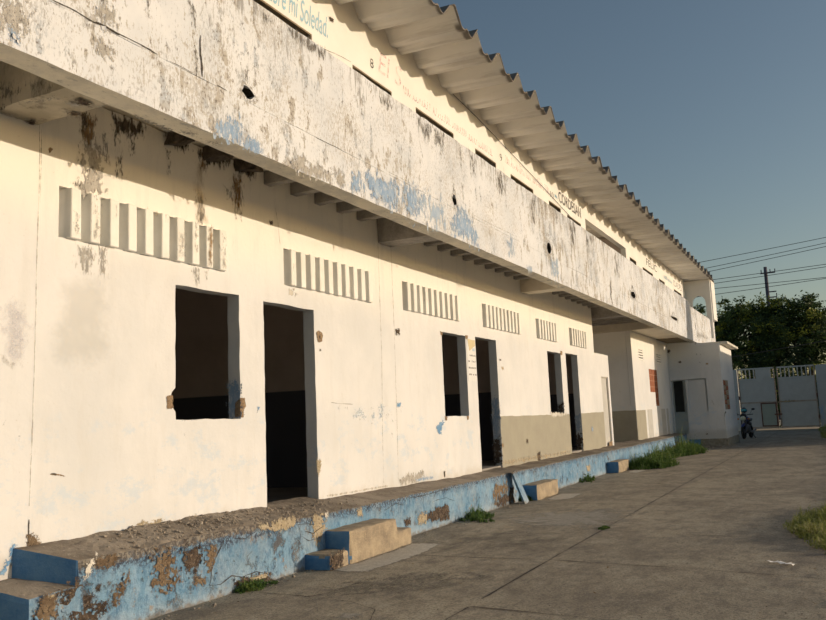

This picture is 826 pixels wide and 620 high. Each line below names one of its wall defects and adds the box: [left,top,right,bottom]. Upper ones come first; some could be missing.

crack [53,0,227,91]
leakage [102,111,172,178]
peeling [291,152,479,251]
leakage [79,213,106,273]
peeling [545,233,562,284]
peeling [226,380,246,419]
peeling [491,395,504,466]
spalling [259,514,296,533]
peeling [311,511,329,547]
spalling [404,505,450,526]
spalling [32,551,131,620]
spalling [149,541,218,599]